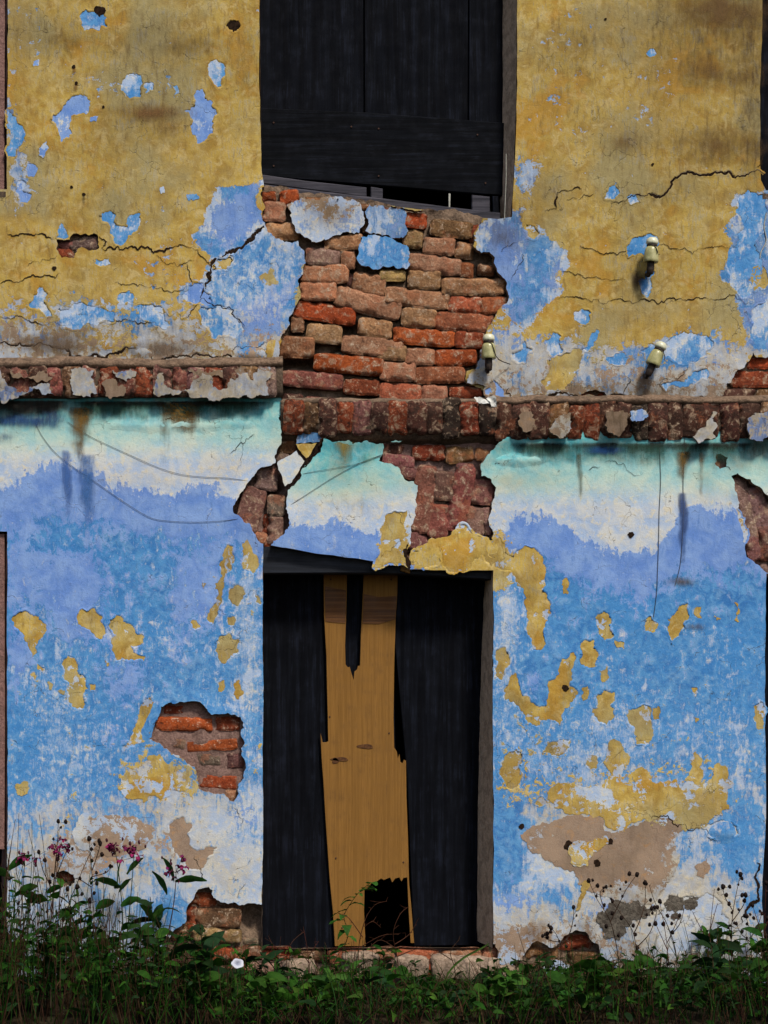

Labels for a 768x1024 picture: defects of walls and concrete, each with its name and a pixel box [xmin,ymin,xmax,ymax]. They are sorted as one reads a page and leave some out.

crack [548,156,765,211]
crack [0,225,272,360]
spalling [261,185,508,399]
crack [562,247,755,304]
peeling [723,188,768,396]
leakage [81,401,257,417]
leakage [63,453,93,509]
spalling [189,432,322,665]
spalling [715,455,768,577]
spalling [118,695,246,803]
peeling [492,609,741,956]
spalling [168,887,606,977]